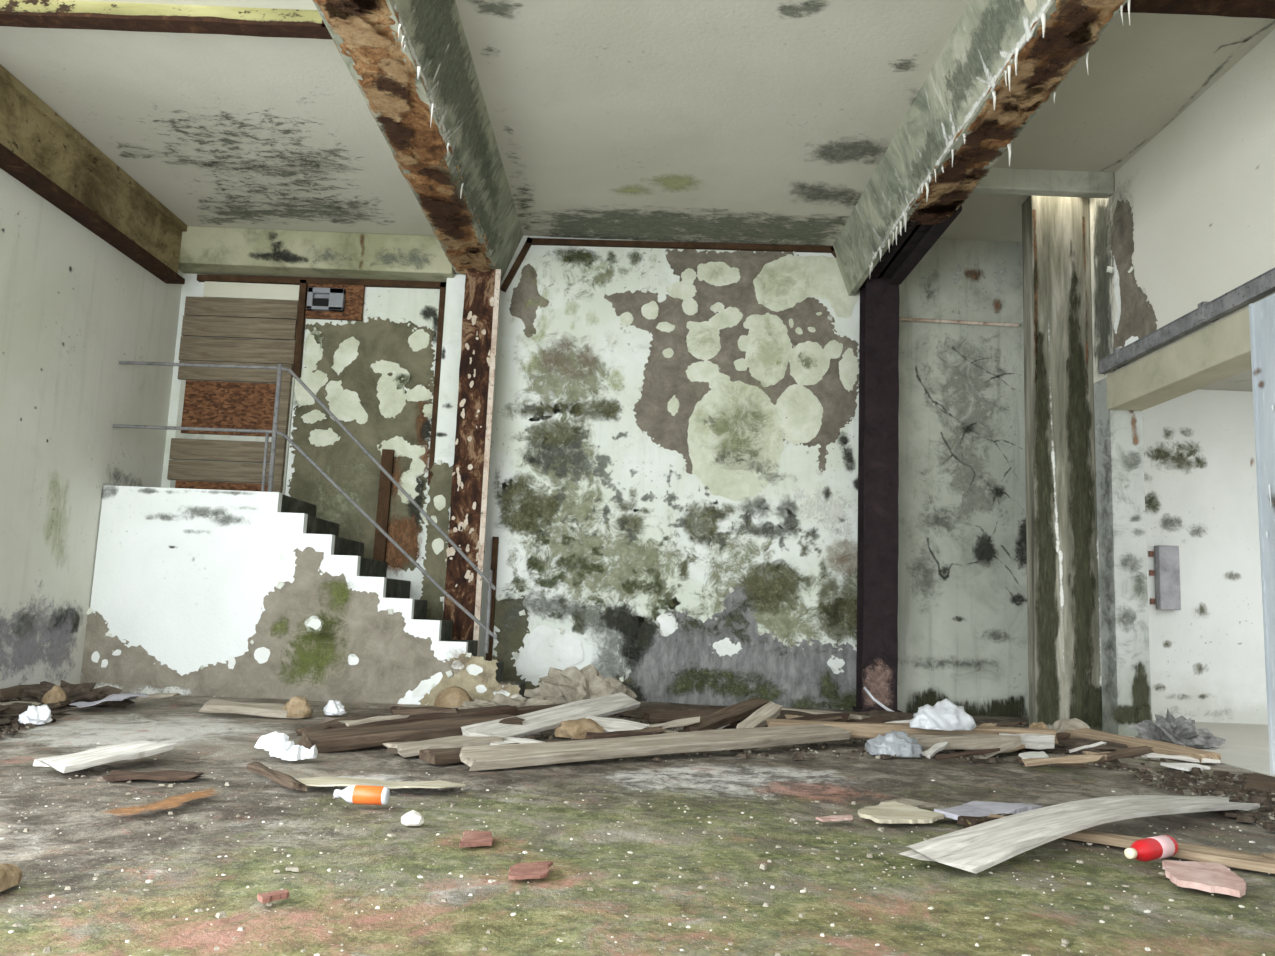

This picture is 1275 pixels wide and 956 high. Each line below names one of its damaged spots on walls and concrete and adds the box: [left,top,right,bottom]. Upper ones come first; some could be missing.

damp [119,110,379,263]
damp [864,0,1052,261]
damp [1094,196,1124,370]
peeling [1106,200,1158,349]
peeling [455,311,491,445]
peeling [80,547,541,706]
peeling [288,316,480,620]
damp [496,400,619,533]
damp [504,489,857,701]
damp [838,434,858,489]
damp [975,536,996,564]
damp [1050,387,1070,624]